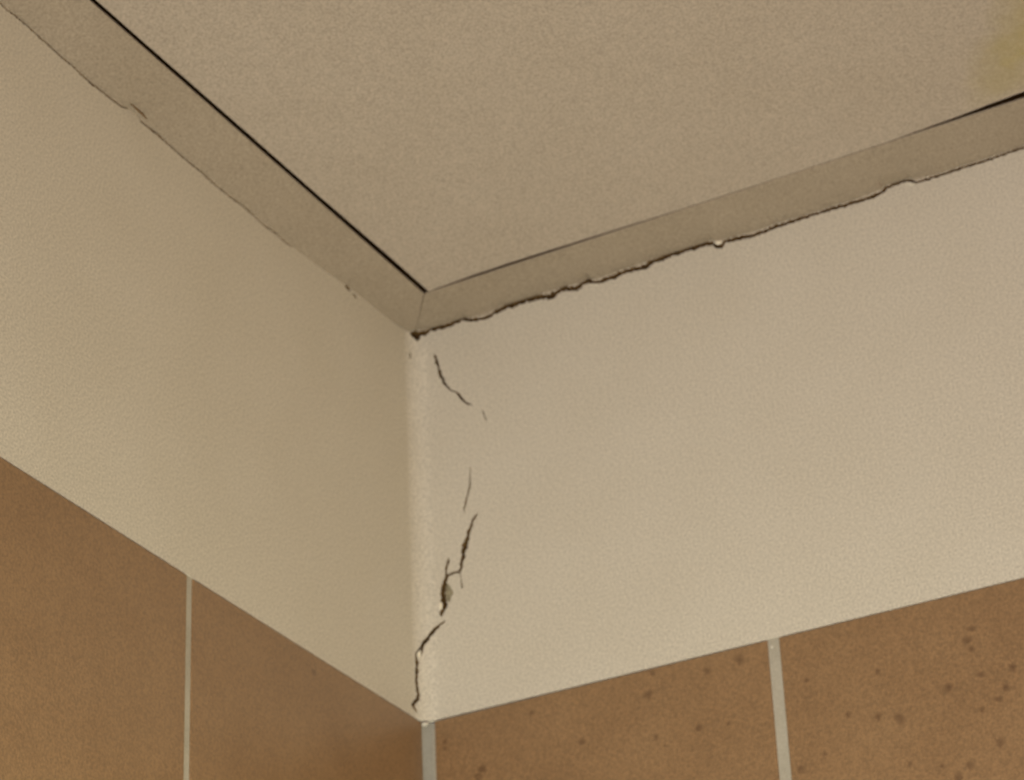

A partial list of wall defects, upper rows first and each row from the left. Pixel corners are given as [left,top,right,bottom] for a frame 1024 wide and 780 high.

crack [410,147,1024,422]
crack [411,467,478,712]